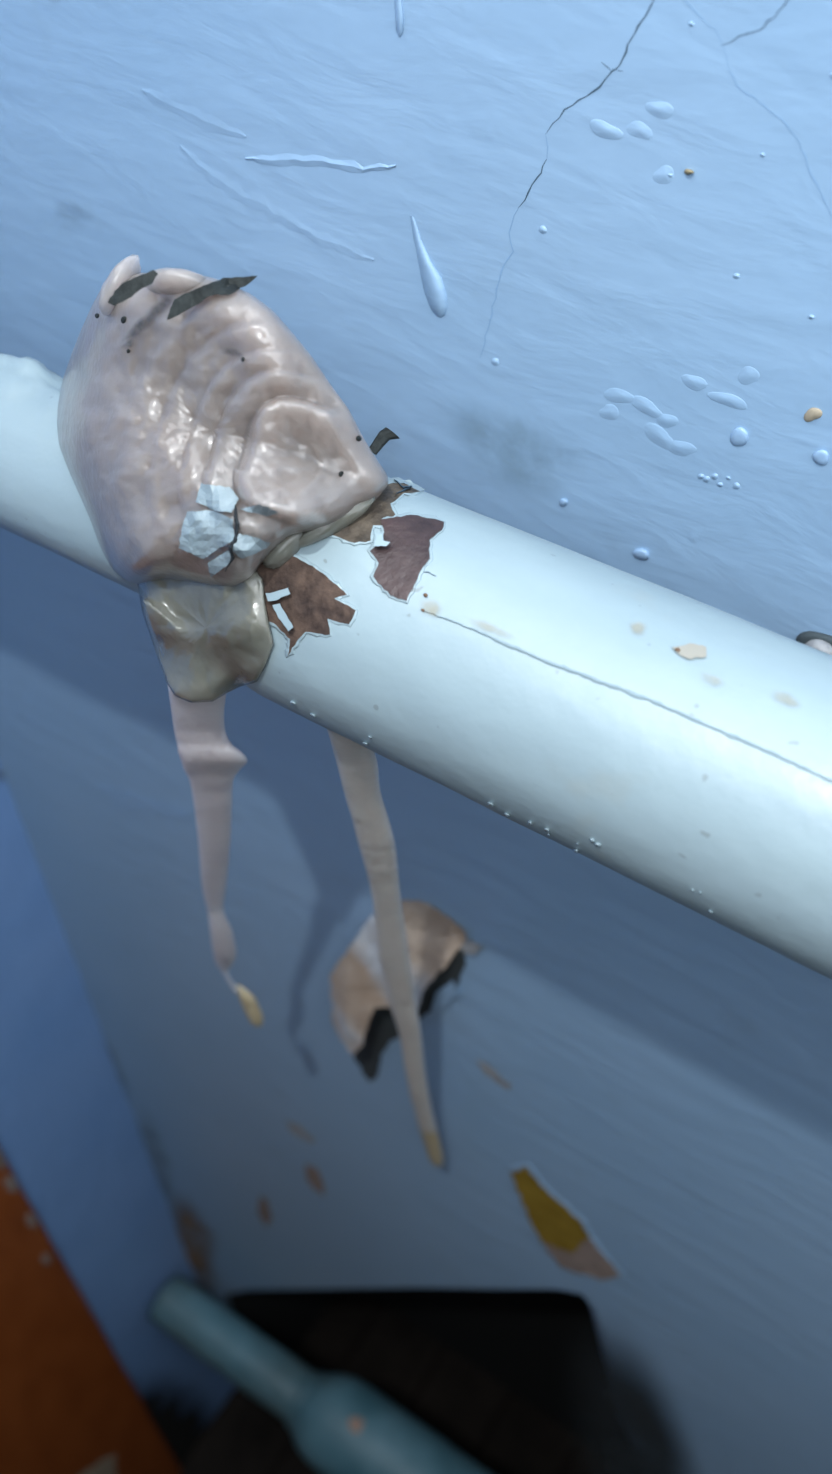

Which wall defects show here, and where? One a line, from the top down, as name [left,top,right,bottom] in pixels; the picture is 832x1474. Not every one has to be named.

crack [480,0,832,357]
peeling [179,483,358,658]
peeling [328,477,446,604]
flaking render [329,915,399,1082]
flaking render [401,900,483,1020]
peeling [507,1164,623,1281]